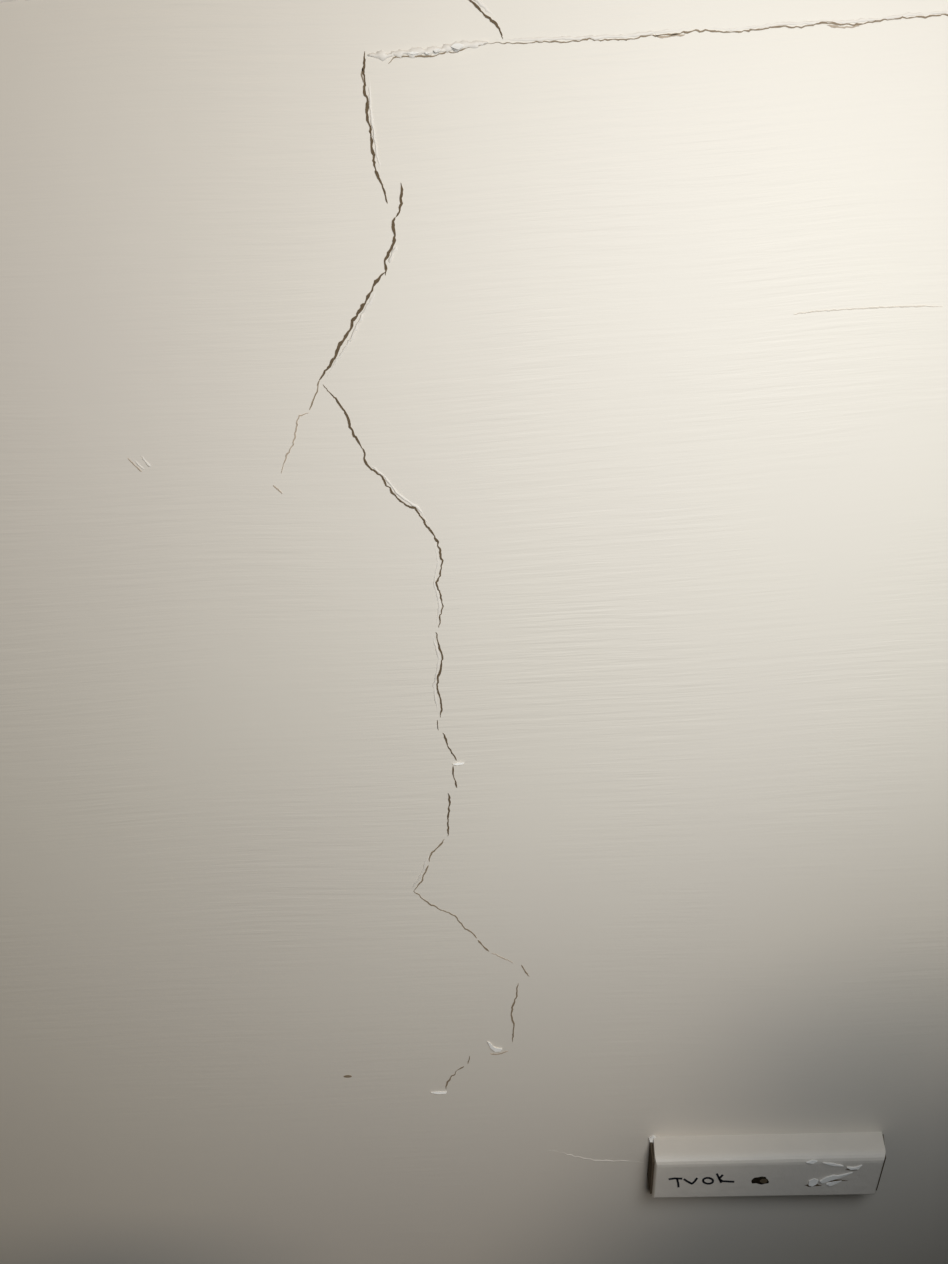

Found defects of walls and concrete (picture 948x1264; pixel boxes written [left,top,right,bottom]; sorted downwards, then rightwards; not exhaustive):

crack [469,0,948,44]
crack [273,52,529,1042]